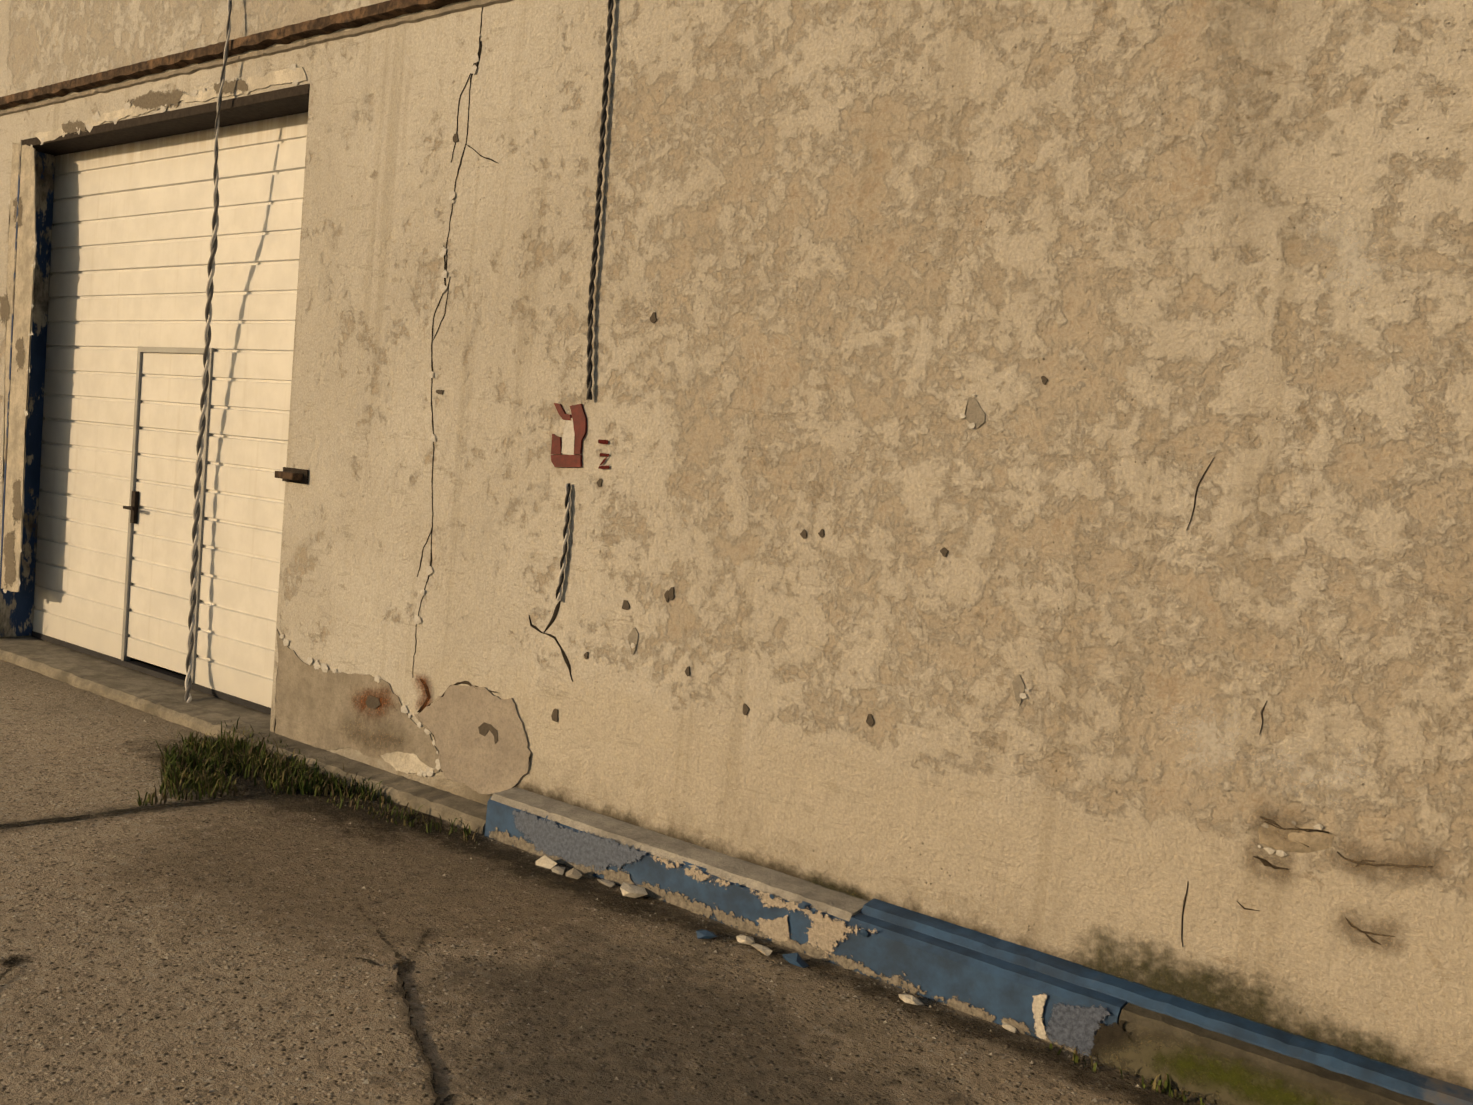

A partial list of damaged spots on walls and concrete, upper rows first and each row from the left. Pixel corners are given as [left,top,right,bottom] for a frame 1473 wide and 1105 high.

peeling [0,64,308,593]
crack [412,7,499,772]
flaking render [274,629,440,777]
peeling [510,807,875,959]
crack [348,902,455,1105]
peeling [1032,994,1110,1057]